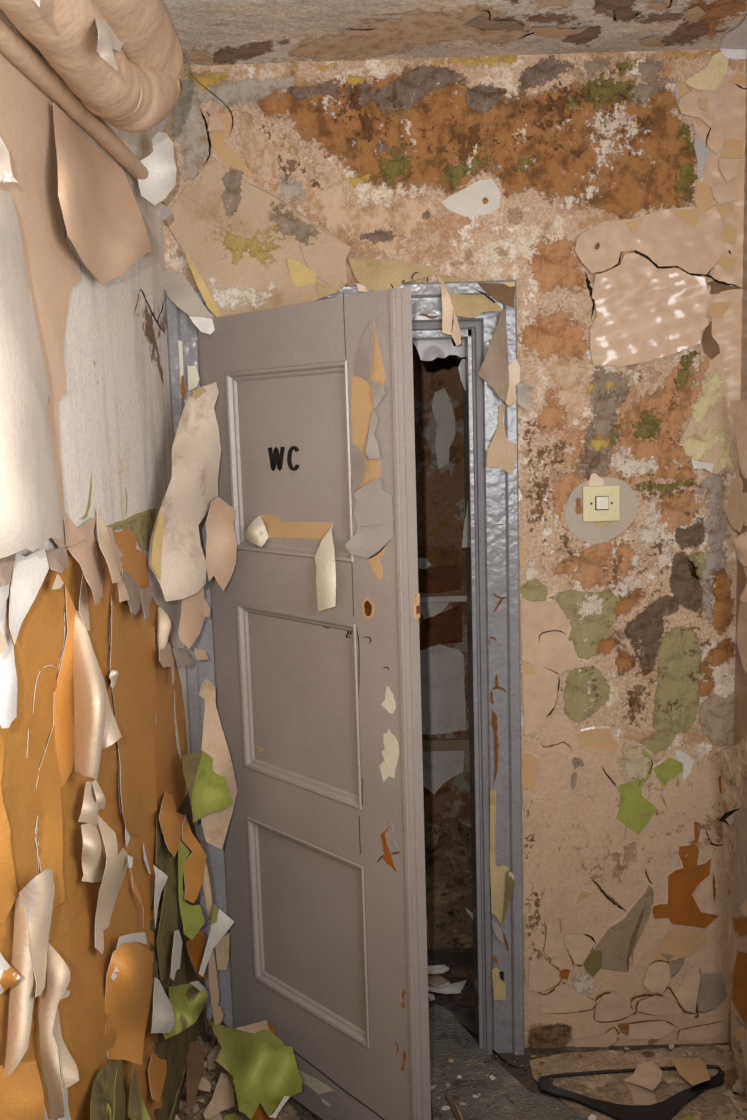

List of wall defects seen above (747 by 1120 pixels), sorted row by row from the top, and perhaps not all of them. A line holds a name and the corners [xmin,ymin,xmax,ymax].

leakage [183,0,747,213]
leakage [359,229,396,244]
crack [584,250,741,320]
peeling [575,71,747,674]
crack [702,321,720,360]
peeling [0,53,532,1120]
peeling [519,498,674,735]
peeling [521,751,541,791]
crack [541,920,596,966]
crack [591,878,628,913]
peeling [528,726,747,1099]